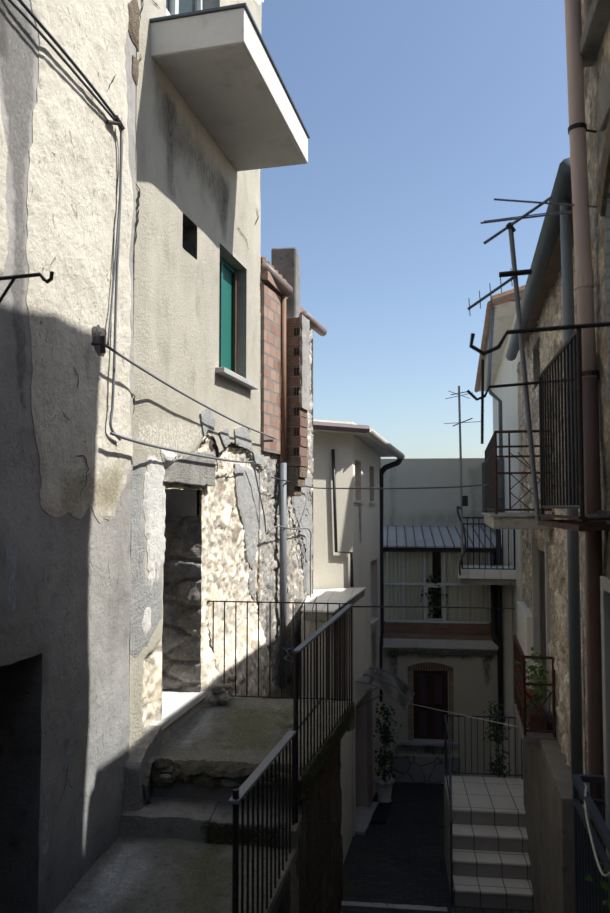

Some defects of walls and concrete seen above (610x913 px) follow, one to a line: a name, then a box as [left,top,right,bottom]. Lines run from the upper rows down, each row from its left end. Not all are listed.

flaking render [0,104,9,274]
flaking render [26,0,269,658]
flaking render [291,473,313,595]